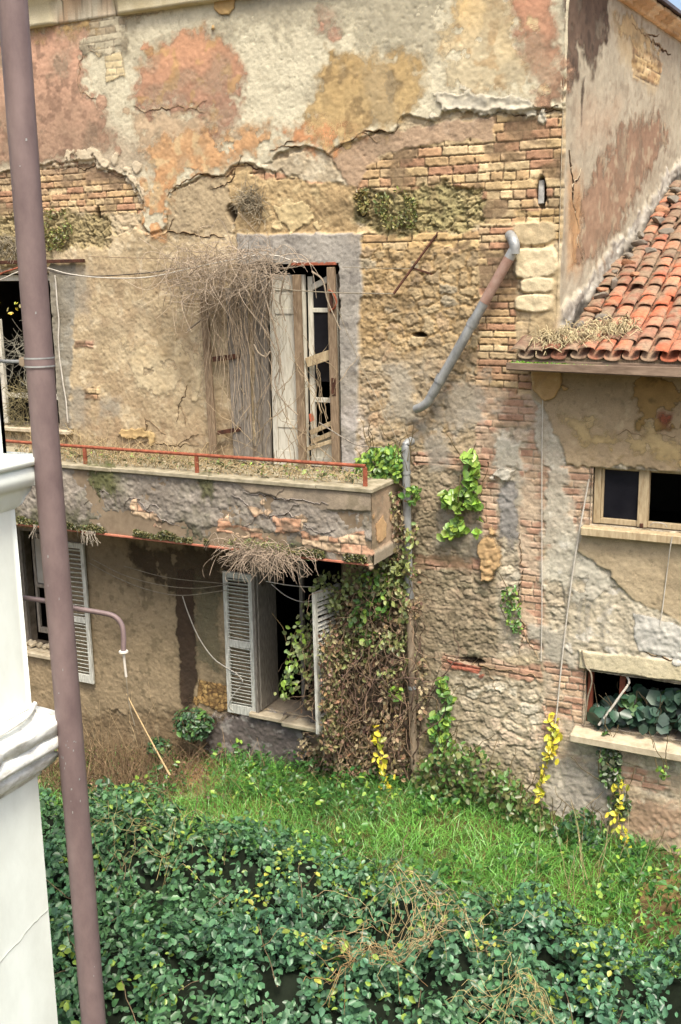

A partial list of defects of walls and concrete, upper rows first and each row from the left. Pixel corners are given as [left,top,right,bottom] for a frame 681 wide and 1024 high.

damp [564,0,610,92]
peeling [0,44,10,164]
peeling [30,0,571,243]
crack [330,118,400,152]
crack [145,140,303,238]
crack [119,386,198,448]
flaking render [531,371,568,401]
crack [84,481,179,526]
crack [234,489,336,534]
flaking render [217,499,400,569]
flaking render [489,468,515,481]
damp [129,542,264,705]